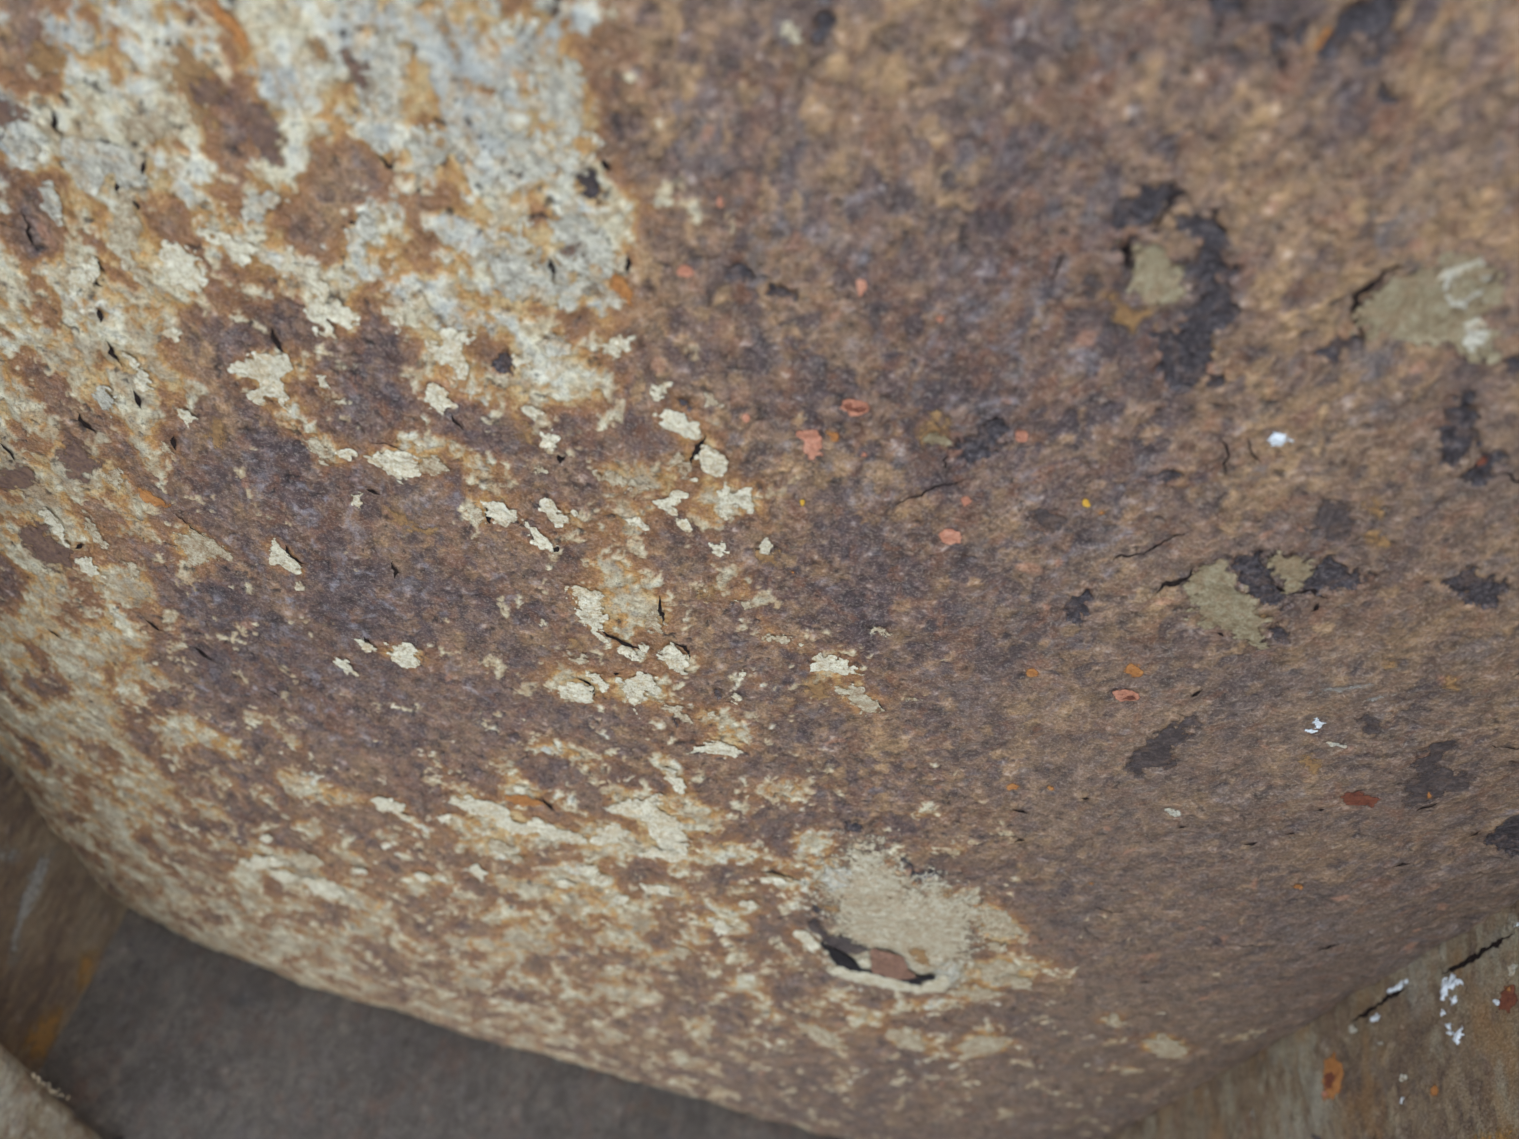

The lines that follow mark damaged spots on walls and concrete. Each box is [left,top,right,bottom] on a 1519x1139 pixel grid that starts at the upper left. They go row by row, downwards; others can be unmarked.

rust [167,43,287,167]
rust [309,37,375,92]
peeling [1,107,291,323]
spalling [1082,181,1243,392]
peeling [227,327,293,411]
rust [0,444,40,498]
rust [55,427,105,484]
peeling [592,382,756,557]
rust [796,429,839,462]
rust [18,517,77,575]
peeling [554,585,747,728]
peeling [436,767,693,864]